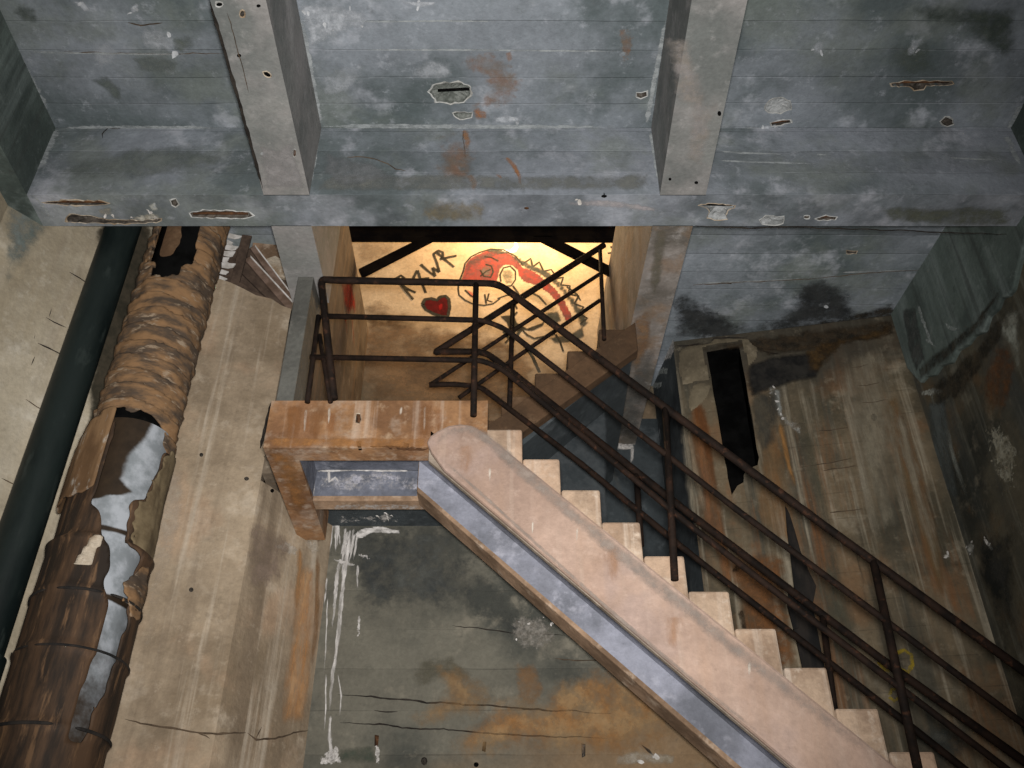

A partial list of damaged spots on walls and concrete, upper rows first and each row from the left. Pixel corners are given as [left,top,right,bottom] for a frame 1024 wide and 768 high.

spalling [418,63,473,120]
spalling [889,80,955,91]
spalling [41,199,162,225]
spalling [169,198,255,219]
spalling [698,203,736,221]
spalling [759,215,784,226]
water stain [699,278,850,330]
water stain [308,505,497,764]
crack [452,625,597,661]
crack [126,719,308,741]
crack [346,695,611,738]
rust [467,680,662,750]